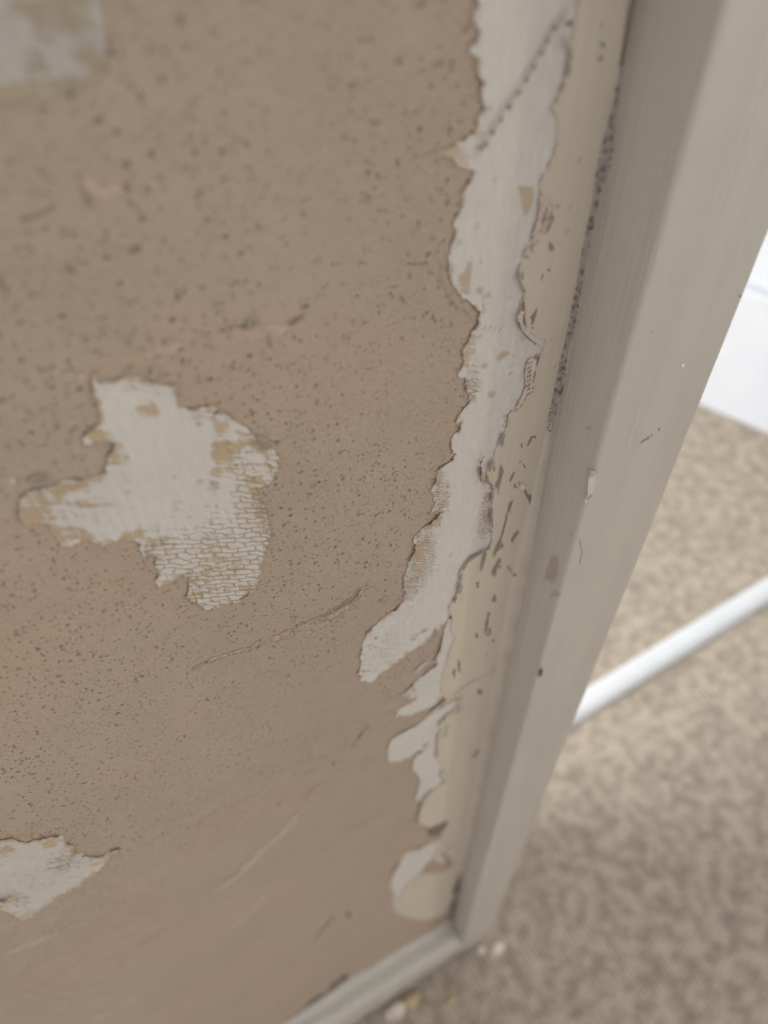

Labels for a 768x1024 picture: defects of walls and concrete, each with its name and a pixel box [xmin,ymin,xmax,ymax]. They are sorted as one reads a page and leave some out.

peeling [395,0,628,921]